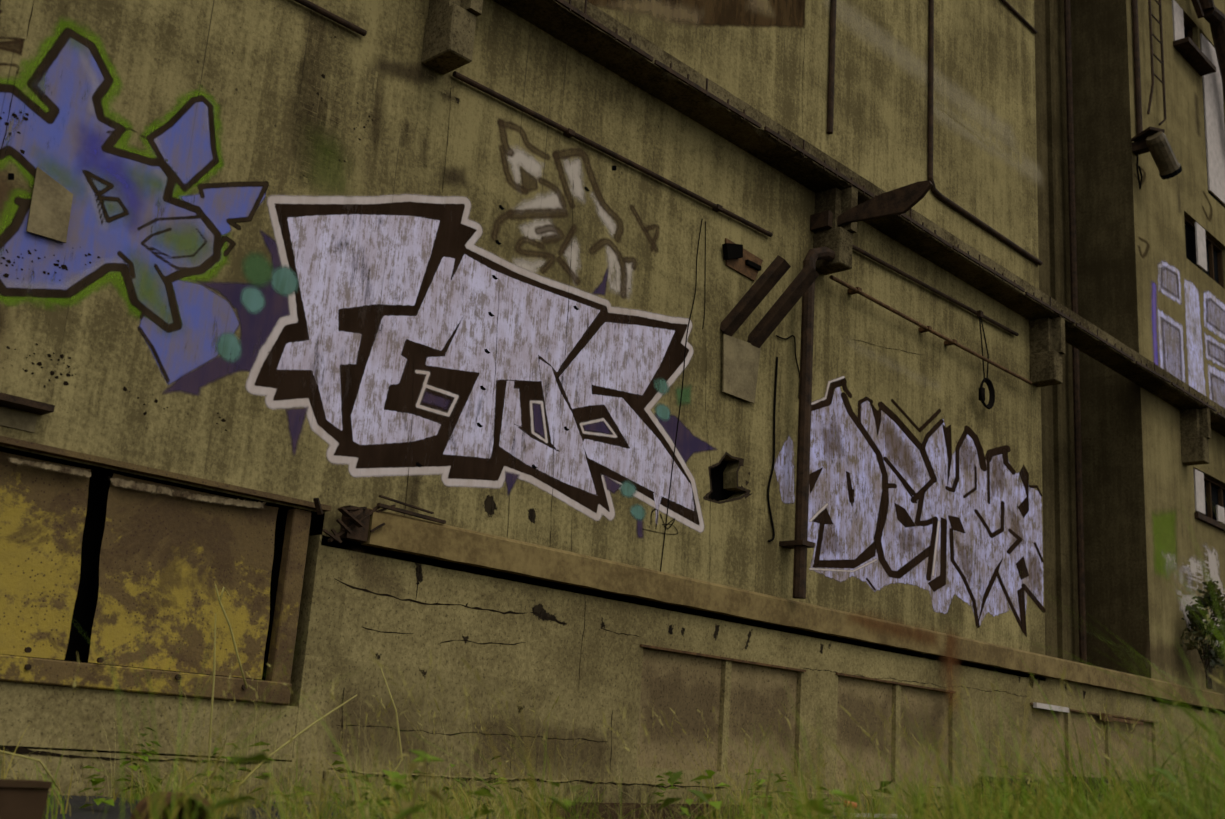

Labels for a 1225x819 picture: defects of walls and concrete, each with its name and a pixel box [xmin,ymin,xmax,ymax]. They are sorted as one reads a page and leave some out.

crack [334,568,639,679]